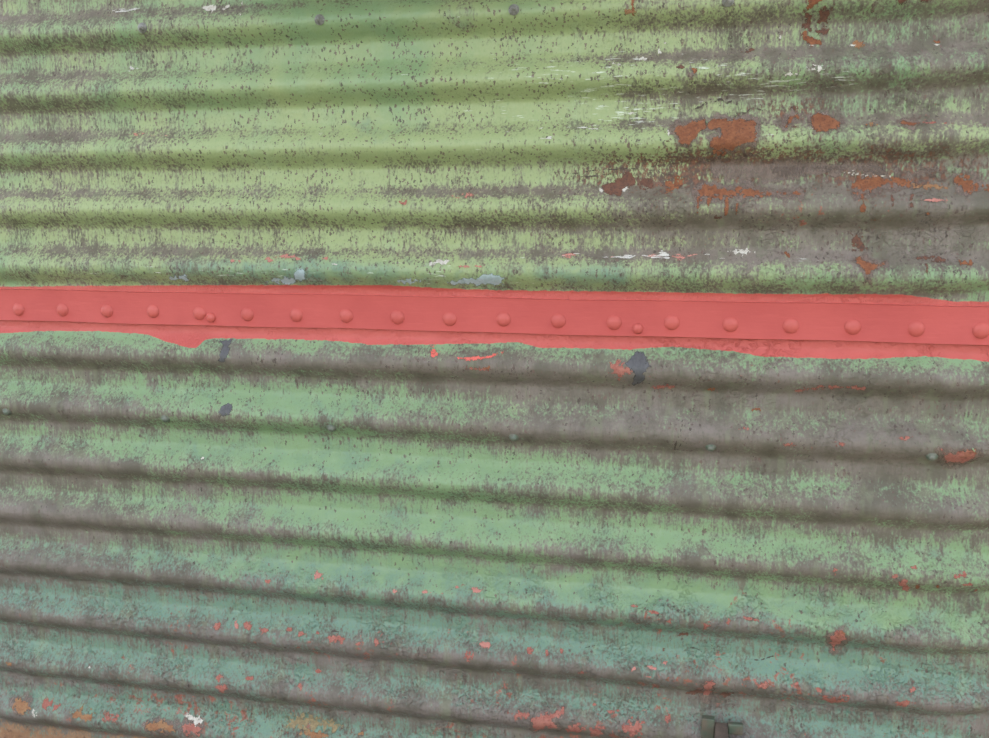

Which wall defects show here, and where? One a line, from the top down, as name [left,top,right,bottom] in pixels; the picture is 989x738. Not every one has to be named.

corrosion [800,0,835,47]
corrosion [666,112,761,157]
corrosion [780,106,845,134]
corrosion [690,180,806,219]
corrosion [844,170,989,213]
corrosion [142,712,204,737]